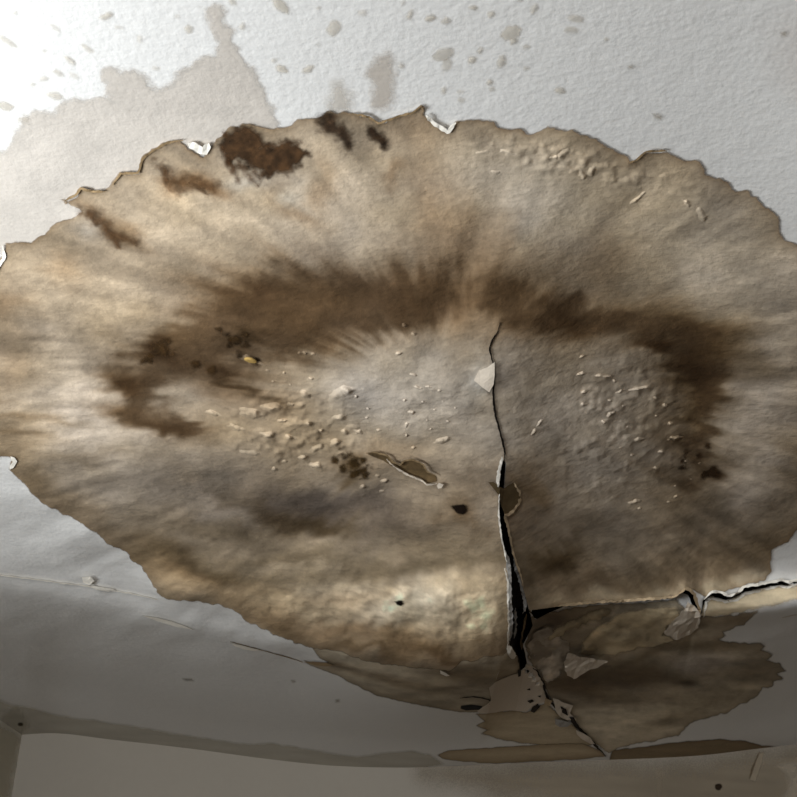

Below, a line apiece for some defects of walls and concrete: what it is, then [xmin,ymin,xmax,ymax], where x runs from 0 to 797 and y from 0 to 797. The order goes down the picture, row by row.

water stain [0,5,278,254]
water stain [368,57,391,106]
water stain [0,105,797,712]
crack [474,324,797,757]
water stain [438,586,797,797]